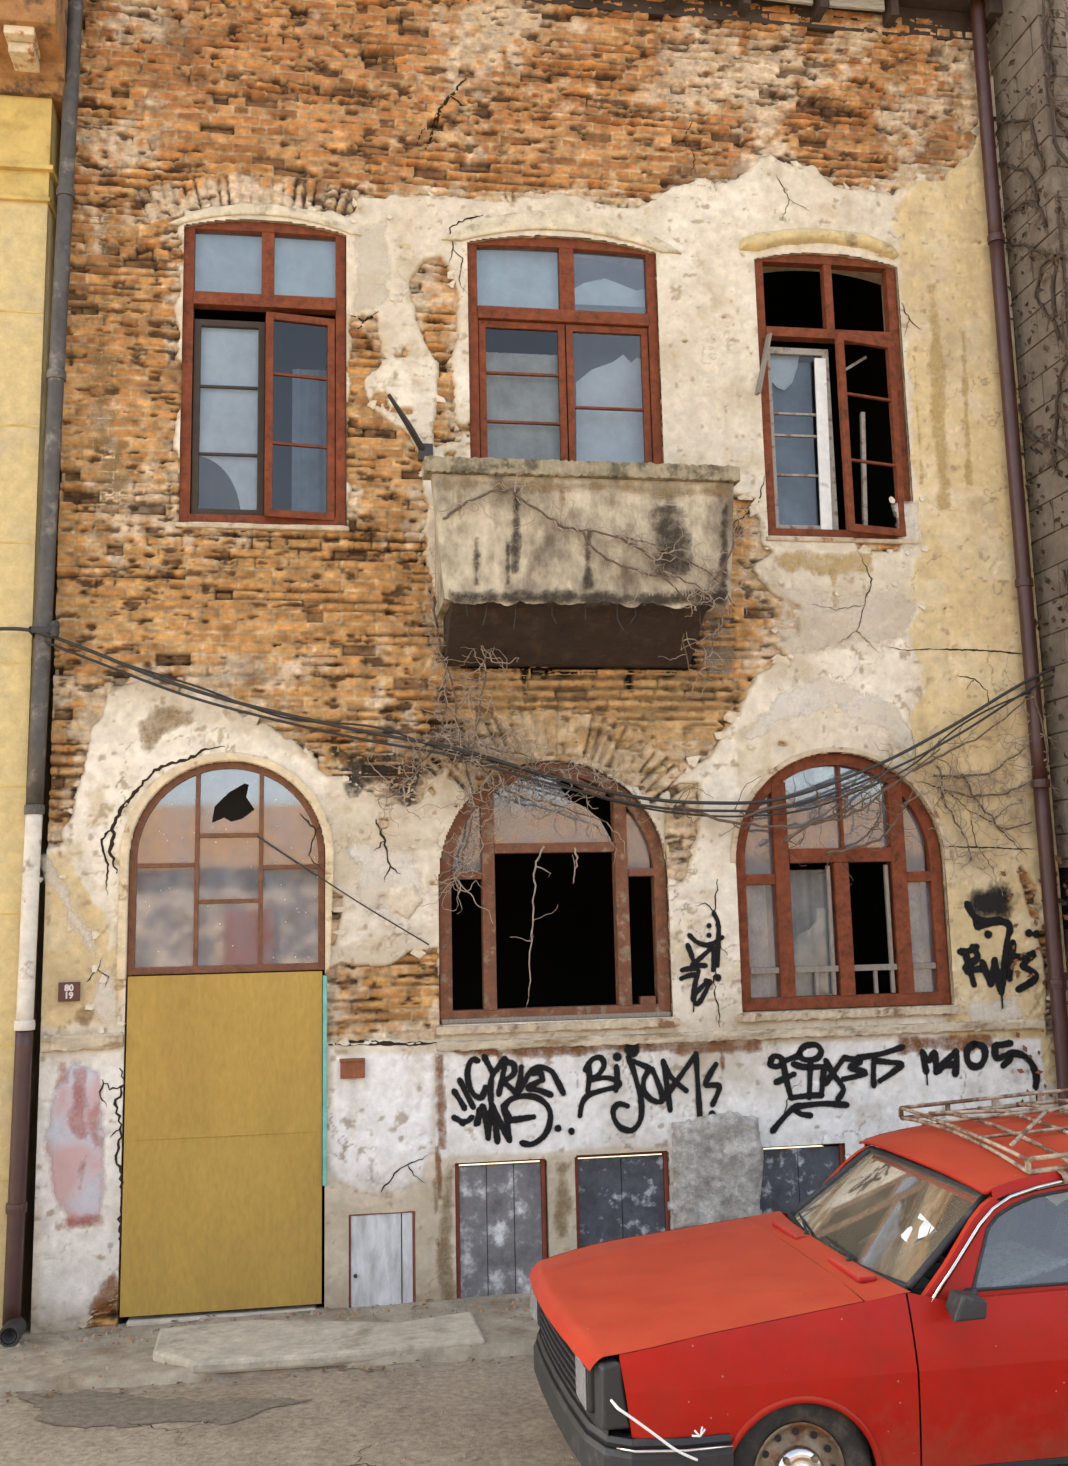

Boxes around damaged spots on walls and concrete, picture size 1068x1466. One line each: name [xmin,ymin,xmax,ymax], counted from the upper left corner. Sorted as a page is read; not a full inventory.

crack [416,78,467,149]
flaking render [40,0,991,1046]
damp [451,482,734,694]
crack [813,553,1022,712]
crack [100,746,225,895]
crack [381,1155,427,1192]
crack [350,1443,388,1466]